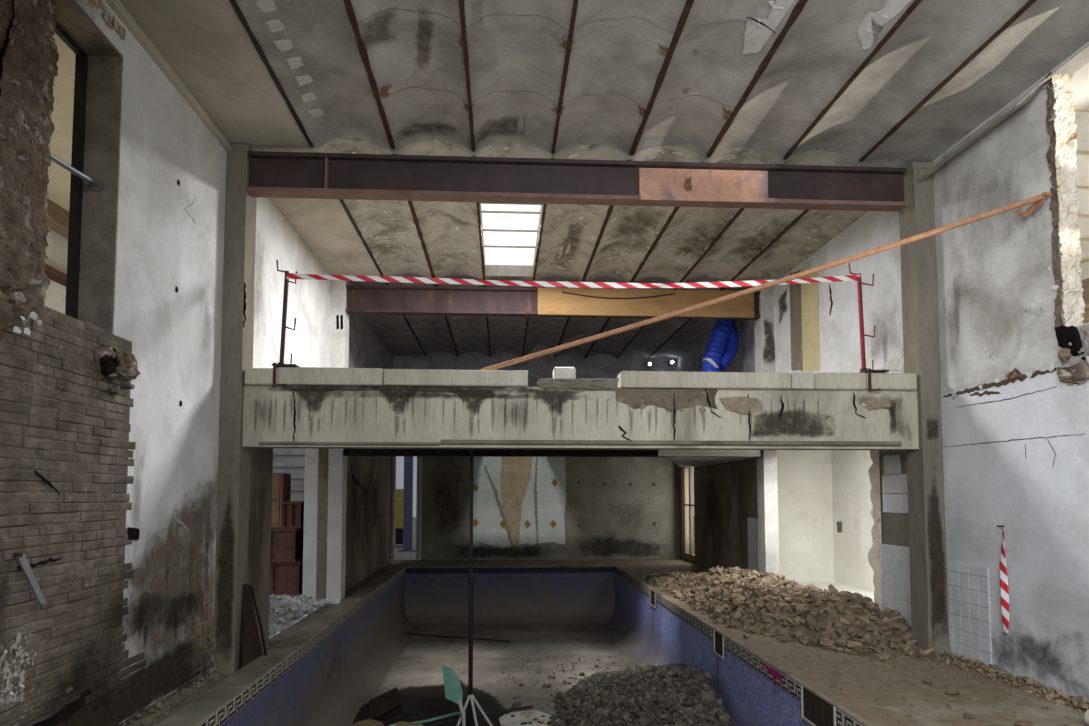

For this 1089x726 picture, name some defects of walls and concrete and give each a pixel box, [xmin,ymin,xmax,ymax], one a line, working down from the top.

crack [0,0,15,97]
spalling [1024,71,1089,386]
flaking render [0,0,147,726]
water stain [282,385,578,413]
crack [670,395,678,441]
crack [705,389,722,418]
crack [745,394,753,441]
water stain [753,410,832,437]
water stain [53,486,234,726]
water stain [0,633,37,711]